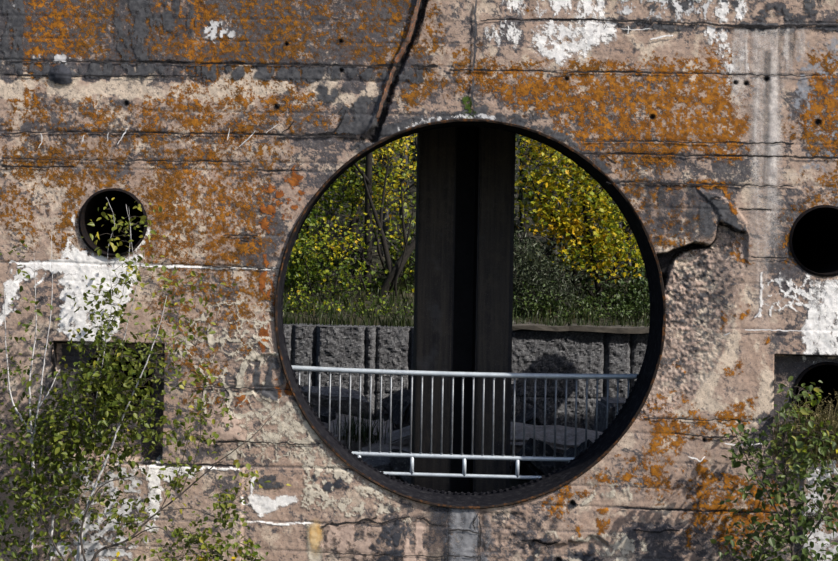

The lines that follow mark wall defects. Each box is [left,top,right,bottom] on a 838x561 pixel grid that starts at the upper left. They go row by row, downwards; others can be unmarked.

crack [1,0,838,172]
damp [485,0,838,253]
corrosion [257,166,305,234]
damp [0,205,278,346]
spalling [637,194,752,418]
damp [758,272,838,362]
peeling [546,531,647,561]
peeling [568,481,639,509]